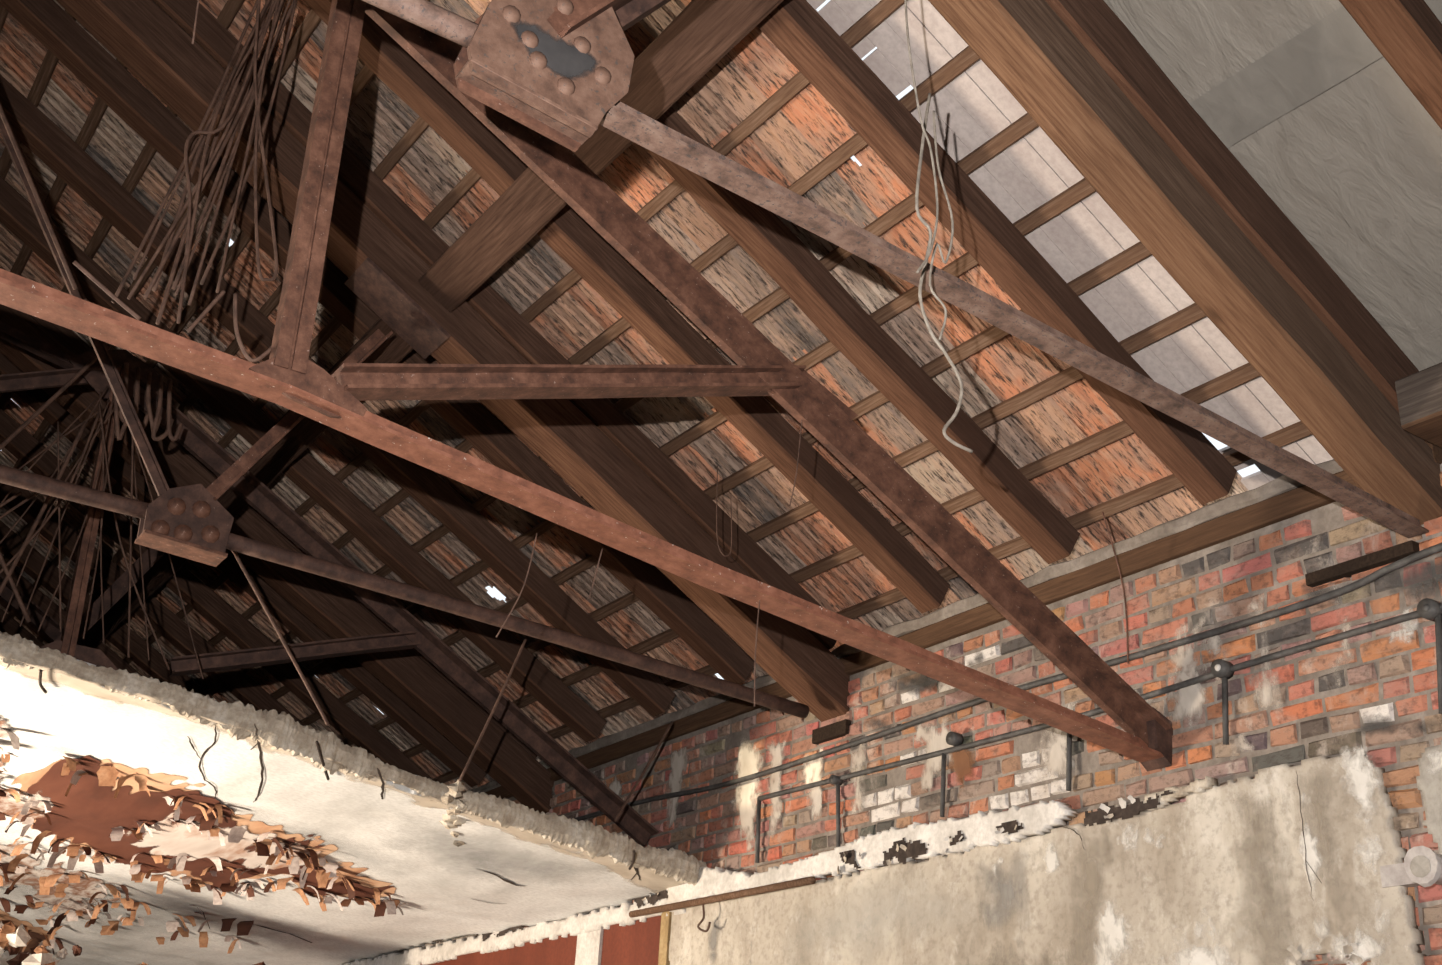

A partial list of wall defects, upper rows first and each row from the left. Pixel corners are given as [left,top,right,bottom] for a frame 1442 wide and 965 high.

spalling [0,631,707,908]
spalling [1084,790,1173,826]
peeling [0,720,406,965]
spalling [883,830,964,866]
spalling [995,820,1024,836]
spalling [473,926,523,941]